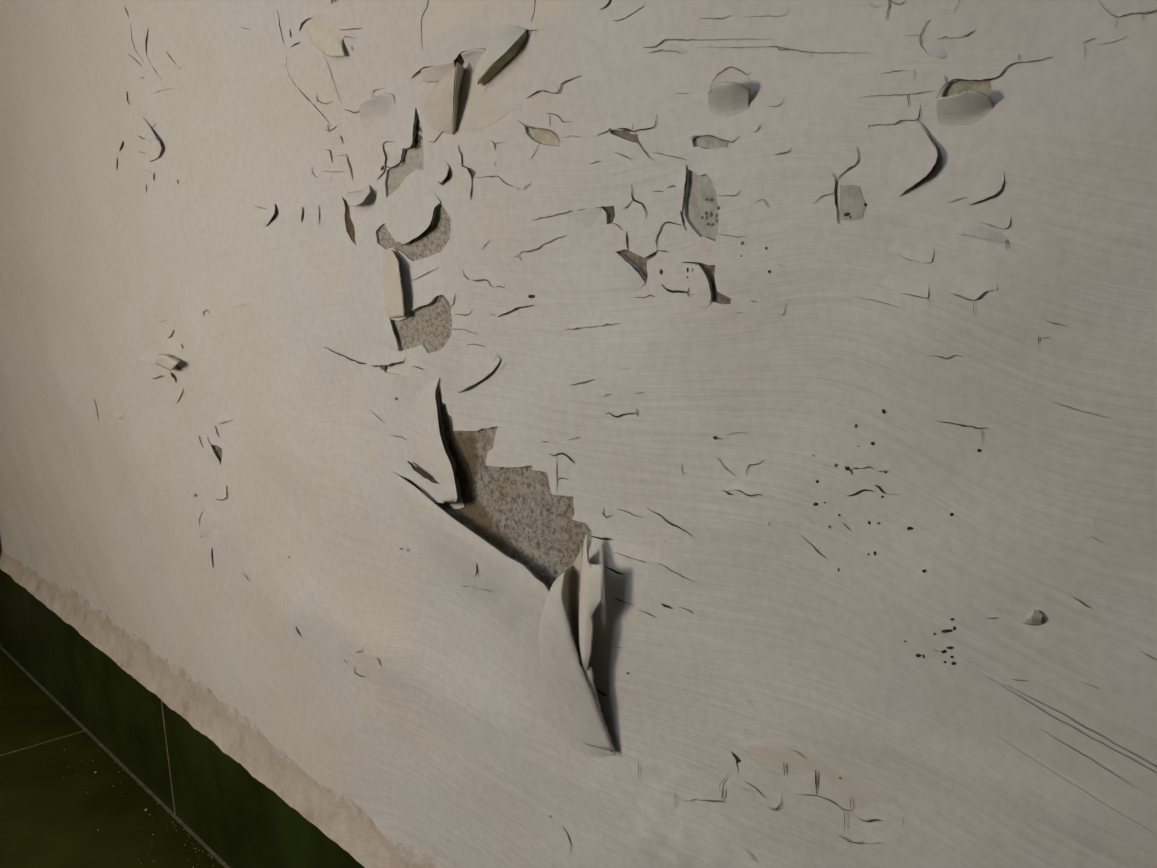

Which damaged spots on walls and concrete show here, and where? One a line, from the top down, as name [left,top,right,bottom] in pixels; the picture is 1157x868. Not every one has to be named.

spalling [324,157,505,393]
peeling [410,17,561,159]
spalling [605,165,736,317]
crack [699,7,789,19]
crack [819,148,867,222]
crack [859,0,975,106]
peeling [889,54,1050,196]
crack [1083,0,1157,58]
spalling [399,461,436,492]
spalling [439,389,616,755]
water stain [0,548,450,868]
crack [631,738,903,844]